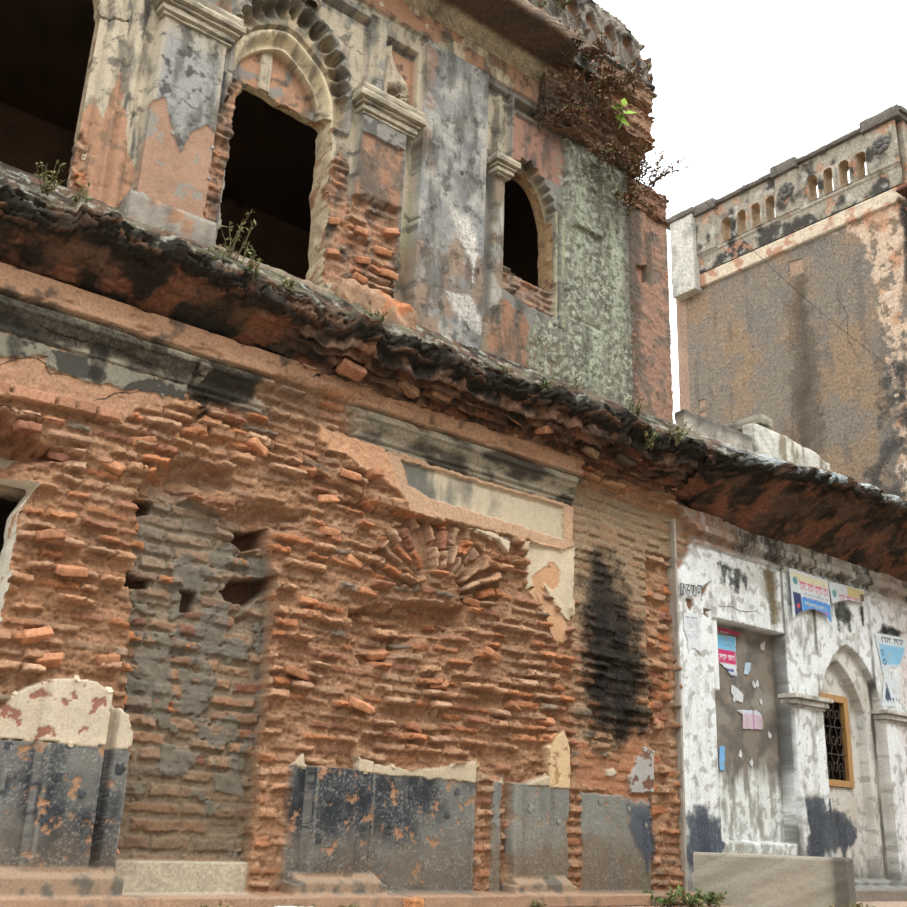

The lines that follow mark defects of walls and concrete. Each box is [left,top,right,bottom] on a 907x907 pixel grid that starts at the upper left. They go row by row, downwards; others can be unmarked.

peeling [69,71,244,223]
peeling [365,115,407,151]
spalling [321,149,401,299]
leakage [898,198,907,279]
leakage [0,295,260,419]
leakage [864,360,907,497]
spalling [0,333,683,907]
leakage [717,562,748,593]
leakage [835,602,864,632]
leakage [880,624,901,637]
leakage [686,805,725,872]
leakage [806,796,857,858]